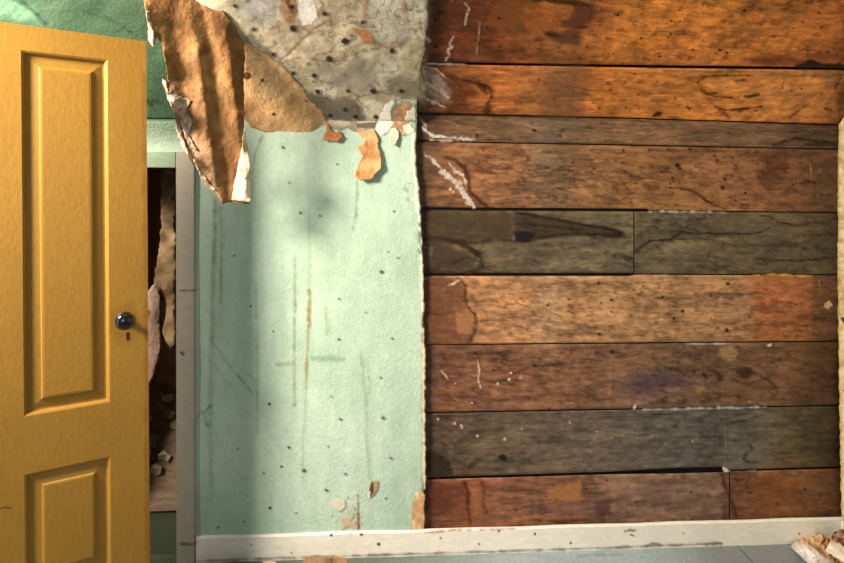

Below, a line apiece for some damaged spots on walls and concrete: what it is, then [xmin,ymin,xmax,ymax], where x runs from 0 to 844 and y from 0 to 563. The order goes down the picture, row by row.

flaking render [195,0,427,316]